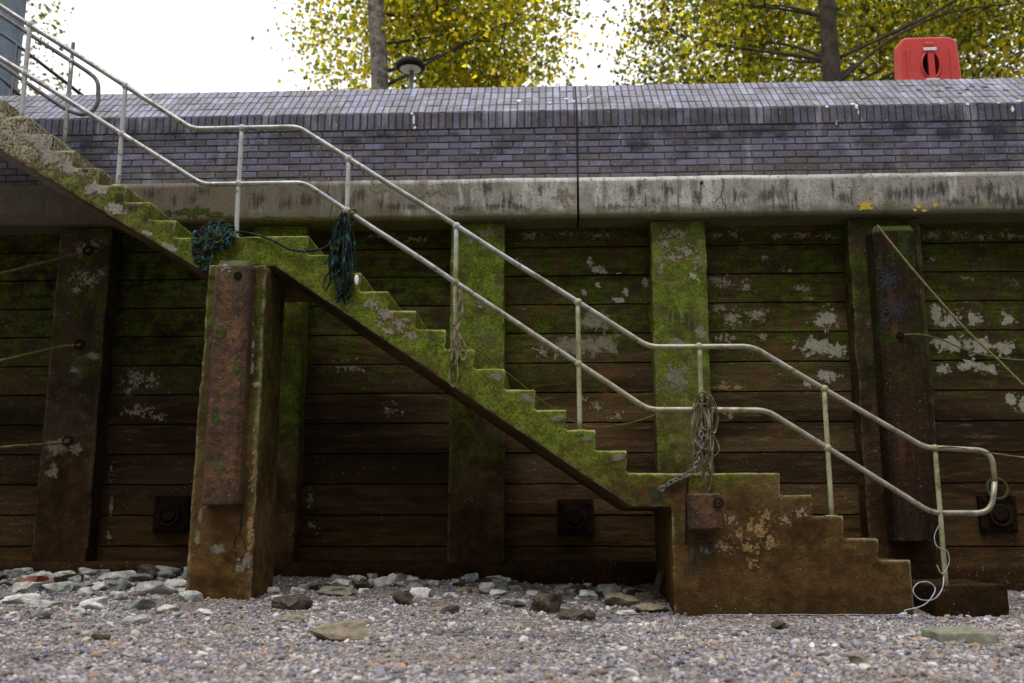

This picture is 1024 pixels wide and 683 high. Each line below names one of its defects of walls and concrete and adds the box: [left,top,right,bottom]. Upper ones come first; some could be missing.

water stain [627,181,673,204]
water stain [888,181,1023,208]
spalling [691,508,808,569]